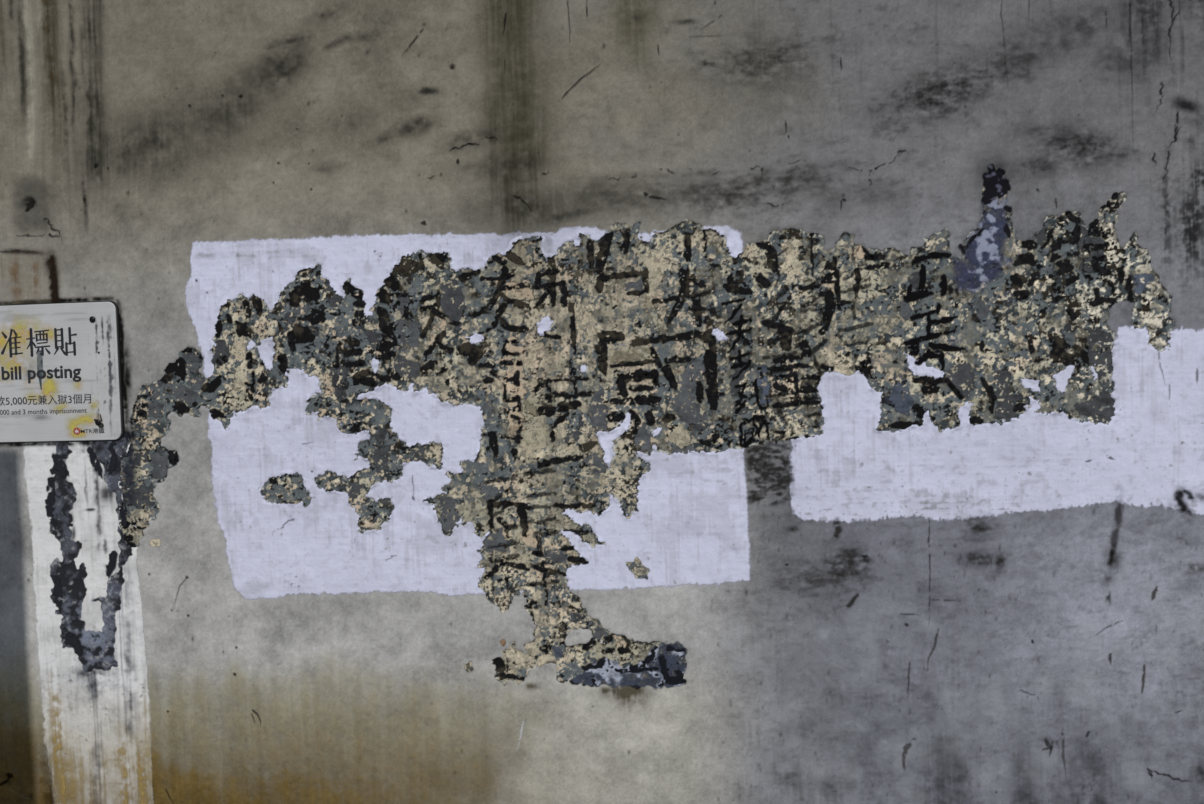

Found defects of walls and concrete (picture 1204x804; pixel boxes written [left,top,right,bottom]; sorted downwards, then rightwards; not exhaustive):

damp [489,0,538,223]
crack [1152,82,1179,171]
crack [1168,0,1180,49]
peeling [119,164,1175,688]